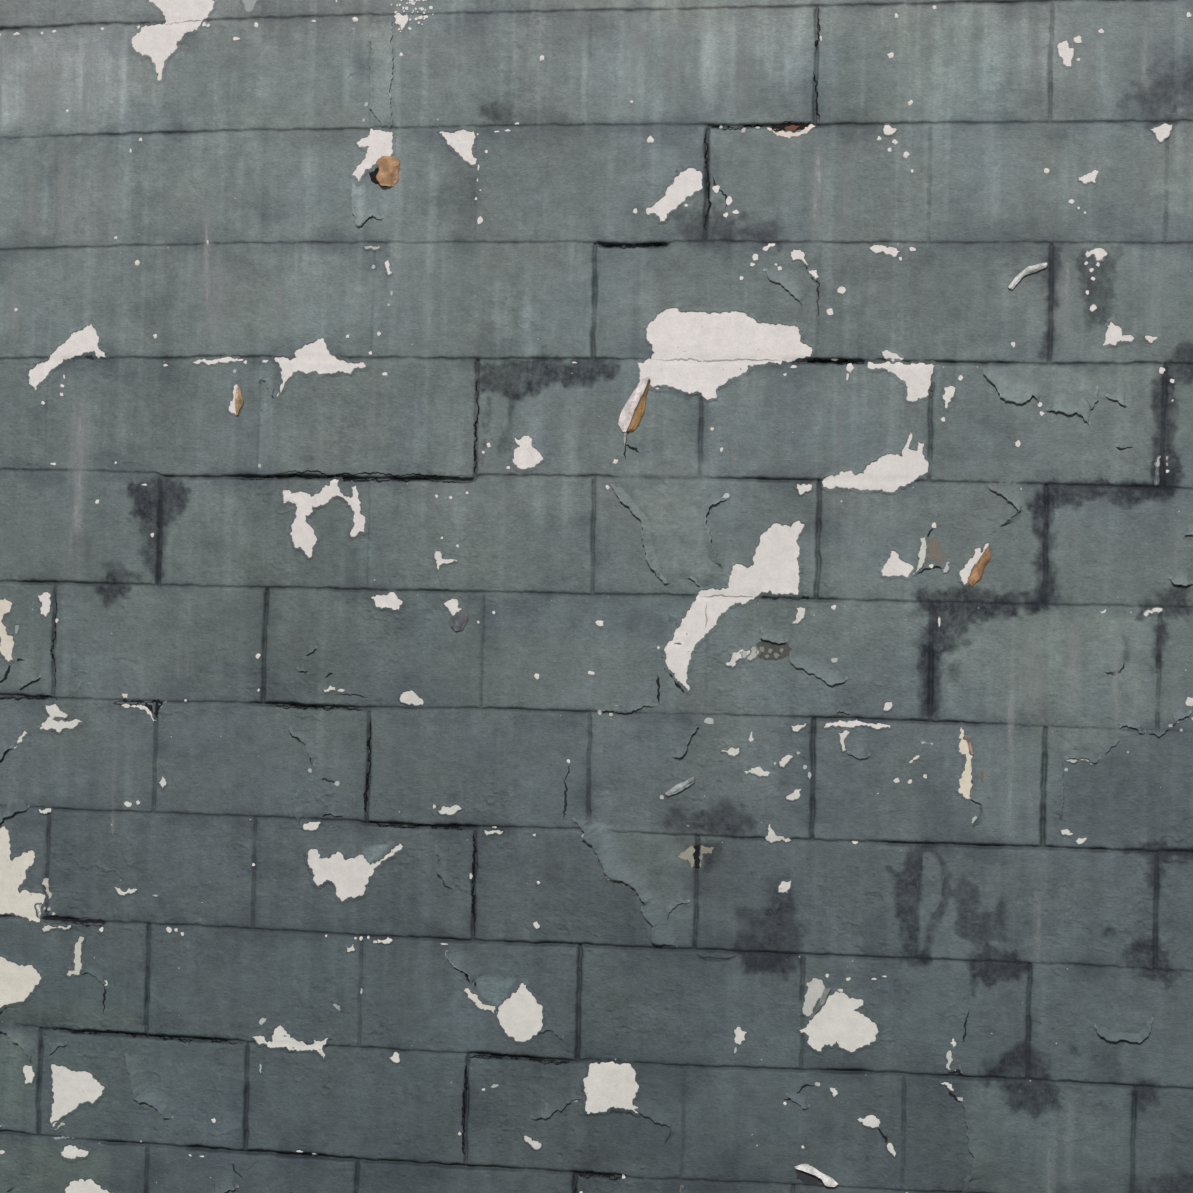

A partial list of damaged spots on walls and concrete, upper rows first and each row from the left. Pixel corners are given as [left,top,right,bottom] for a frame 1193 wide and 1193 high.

peeling [129,0,218,85]
peeling [26,321,109,405]
leakage [479,357,613,399]
peeling [618,304,817,459]
peeling [794,423,933,497]
peeling [279,476,369,561]
peeling [597,515,848,716]
peeling [293,793,408,905]
peeling [0,798,108,1013]
peeling [794,974,883,1056]
peeling [0,952,122,1193]
peeling [530,1055,676,1146]